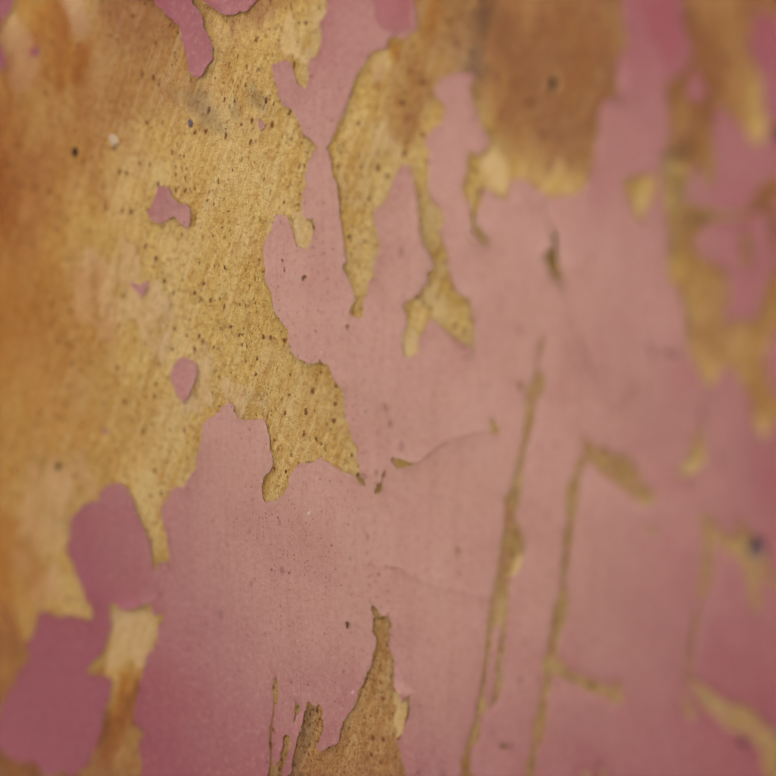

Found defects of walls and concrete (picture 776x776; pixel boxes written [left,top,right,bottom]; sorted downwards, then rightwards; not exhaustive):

peeling [624,0,776,438]
peeling [0,0,628,710]
peeling [0,603,164,776]
peeling [268,605,414,776]
peeling [459,743,476,776]